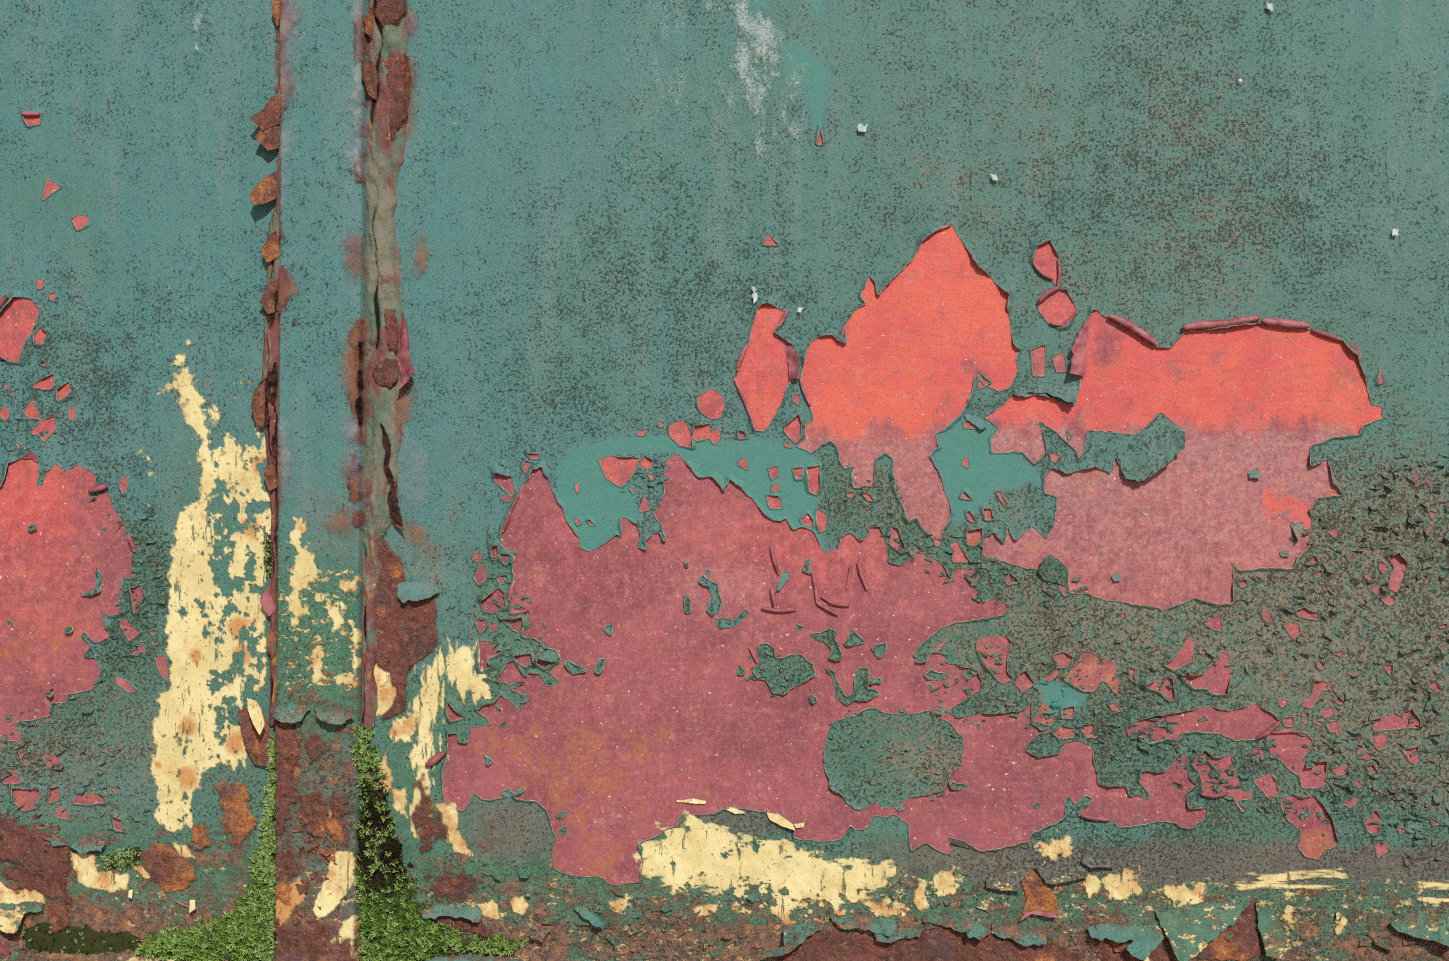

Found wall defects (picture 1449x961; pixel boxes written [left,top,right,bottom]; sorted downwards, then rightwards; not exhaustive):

rust [332,308,415,528]
peeling [0,278,271,859]
rust [375,538,440,720]
peeling [275,223,1449,961]
peeling [0,882,45,904]
rust [0,815,73,954]
peeling [69,852,151,892]
rust [142,780,257,892]
rust [238,702,356,961]
rust [412,773,449,853]
rust [764,855,1292,961]
rust [1390,906,1449,961]